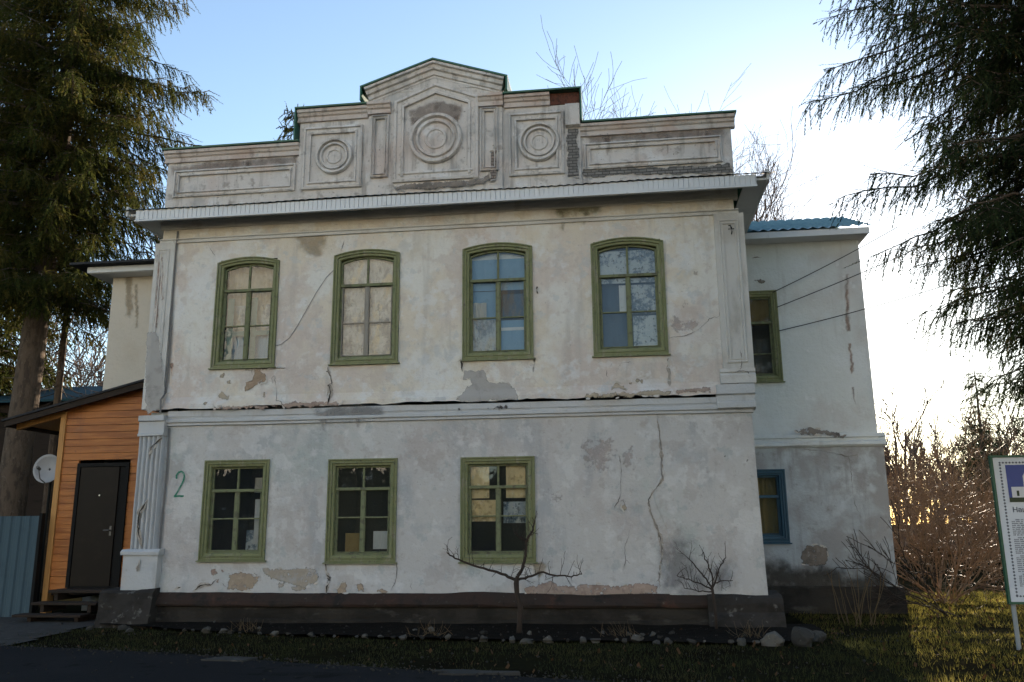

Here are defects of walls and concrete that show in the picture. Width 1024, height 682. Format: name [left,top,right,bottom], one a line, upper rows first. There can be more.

flaking render [566,127,733,178]
flaking render [203,369,344,410]
flaking render [794,427,846,438]
crack [614,419,665,588]
flaking render [801,544,829,566]
flaking render [211,567,364,594]
flaking render [524,581,657,595]